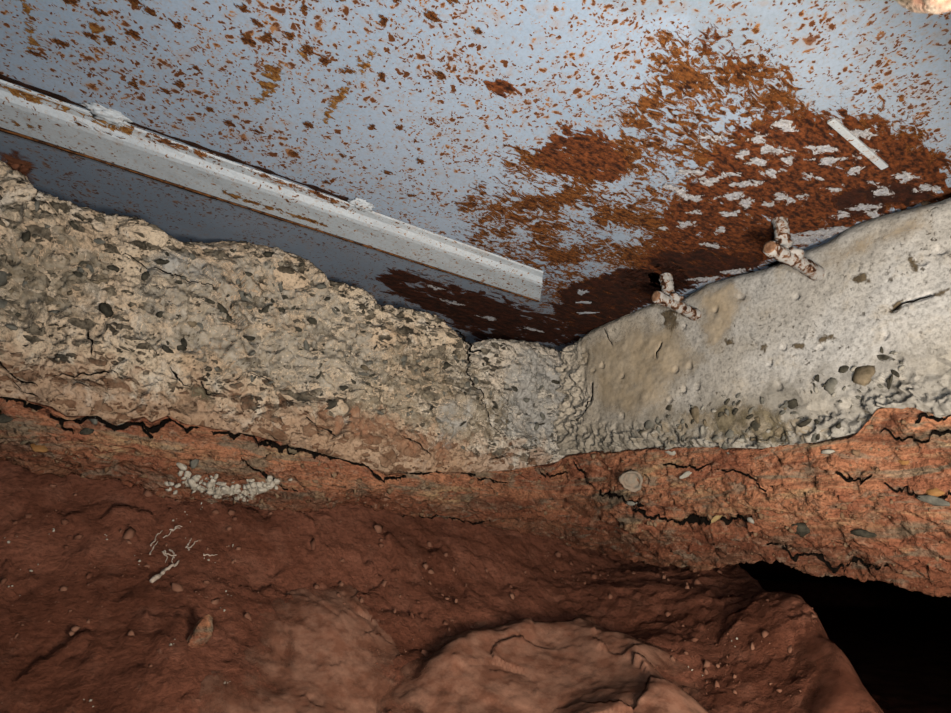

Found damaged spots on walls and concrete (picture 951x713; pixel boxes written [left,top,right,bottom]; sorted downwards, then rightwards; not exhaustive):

corrosion [0,0,951,346]
peeling [575,290,598,314]
crack [0,322,508,492]
spalling [631,393,841,454]
spalling [810,347,905,409]
crack [881,413,951,444]
crack [539,462,754,526]
crack [663,463,773,492]
crack [837,471,951,504]
crack [767,542,889,574]